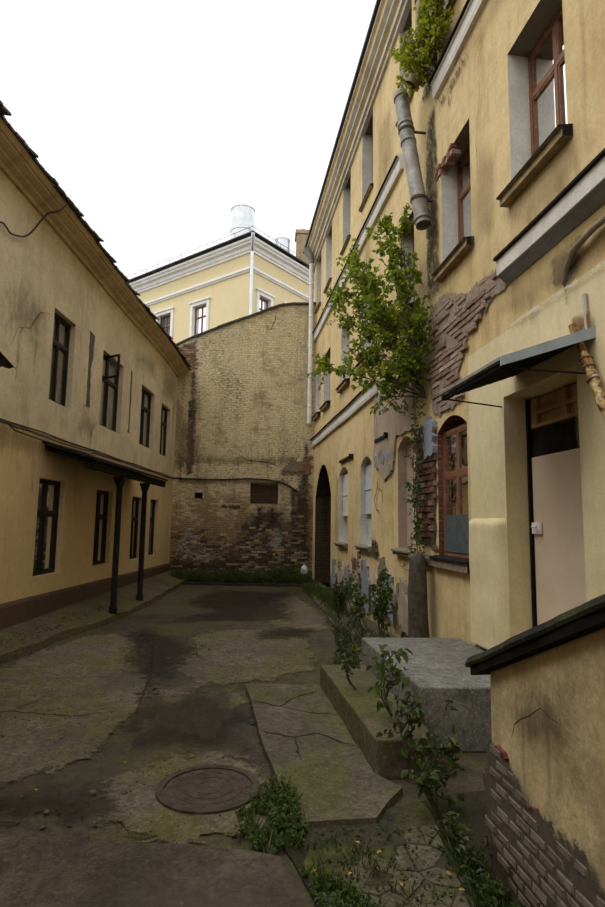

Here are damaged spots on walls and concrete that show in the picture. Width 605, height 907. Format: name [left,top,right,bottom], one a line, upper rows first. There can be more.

flaking render [179,342,198,369]
flaking render [372,269,512,551]
crack [248,691,358,777]
flaking render [482,730,605,907]